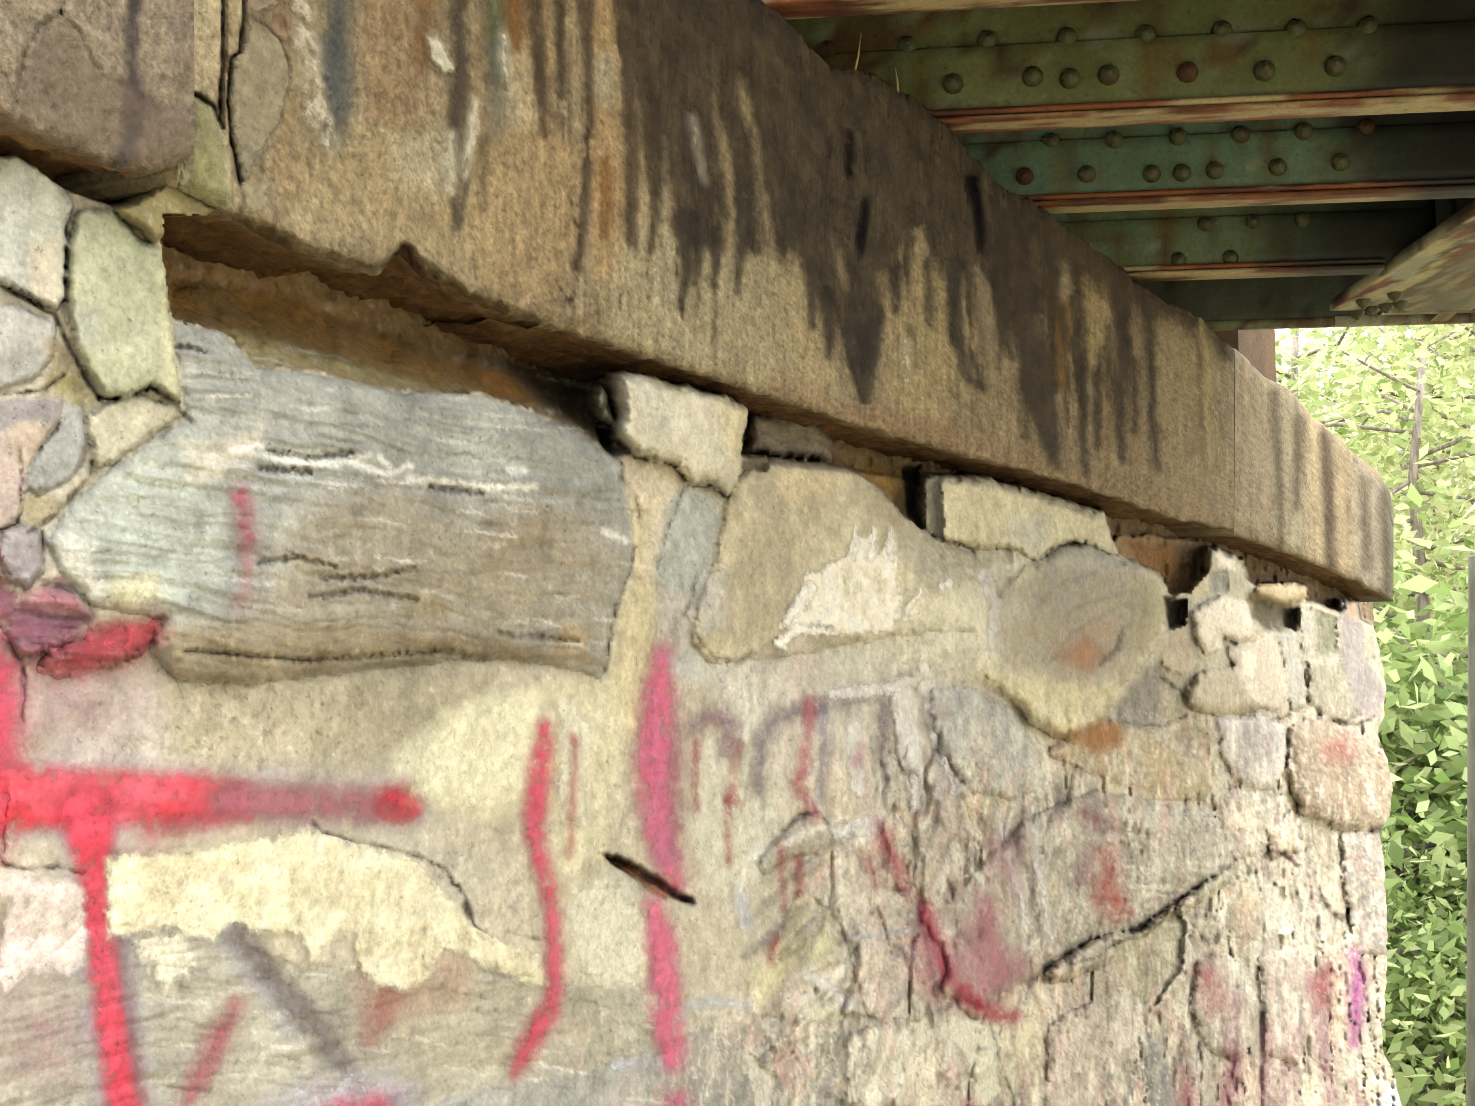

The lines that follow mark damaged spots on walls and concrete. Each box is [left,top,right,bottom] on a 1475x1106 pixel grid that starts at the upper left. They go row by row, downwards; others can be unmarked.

damp [294,0,344,150]
damp [428,0,509,225]
damp [529,0,594,138]
spalling [336,245,504,314]
damp [576,159,593,270]
damp [615,0,1230,507]
peeling [774,527,953,650]
crack [1248,851,1351,918]